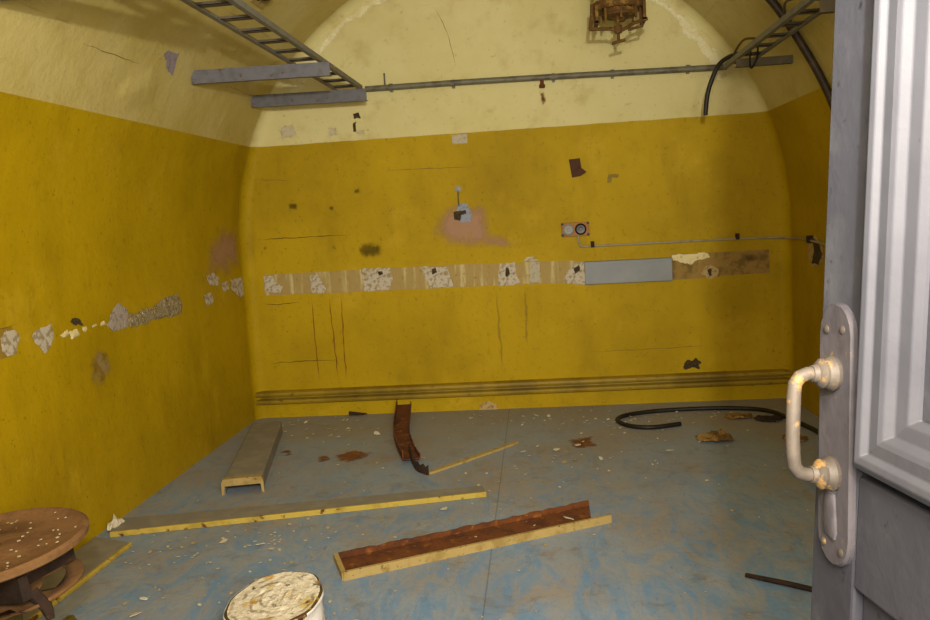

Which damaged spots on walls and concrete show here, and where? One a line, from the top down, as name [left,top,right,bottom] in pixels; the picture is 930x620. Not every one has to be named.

flaking render [454,203,471,222]
flaking render [263,276,283,293]
flaking render [310,274,326,294]
flaking render [361,268,393,292]
flaking render [421,266,453,288]
flaking render [497,257,541,286]
flaking render [564,262,585,285]
flaking render [32,294,183,353]
flaking render [1,330,20,356]